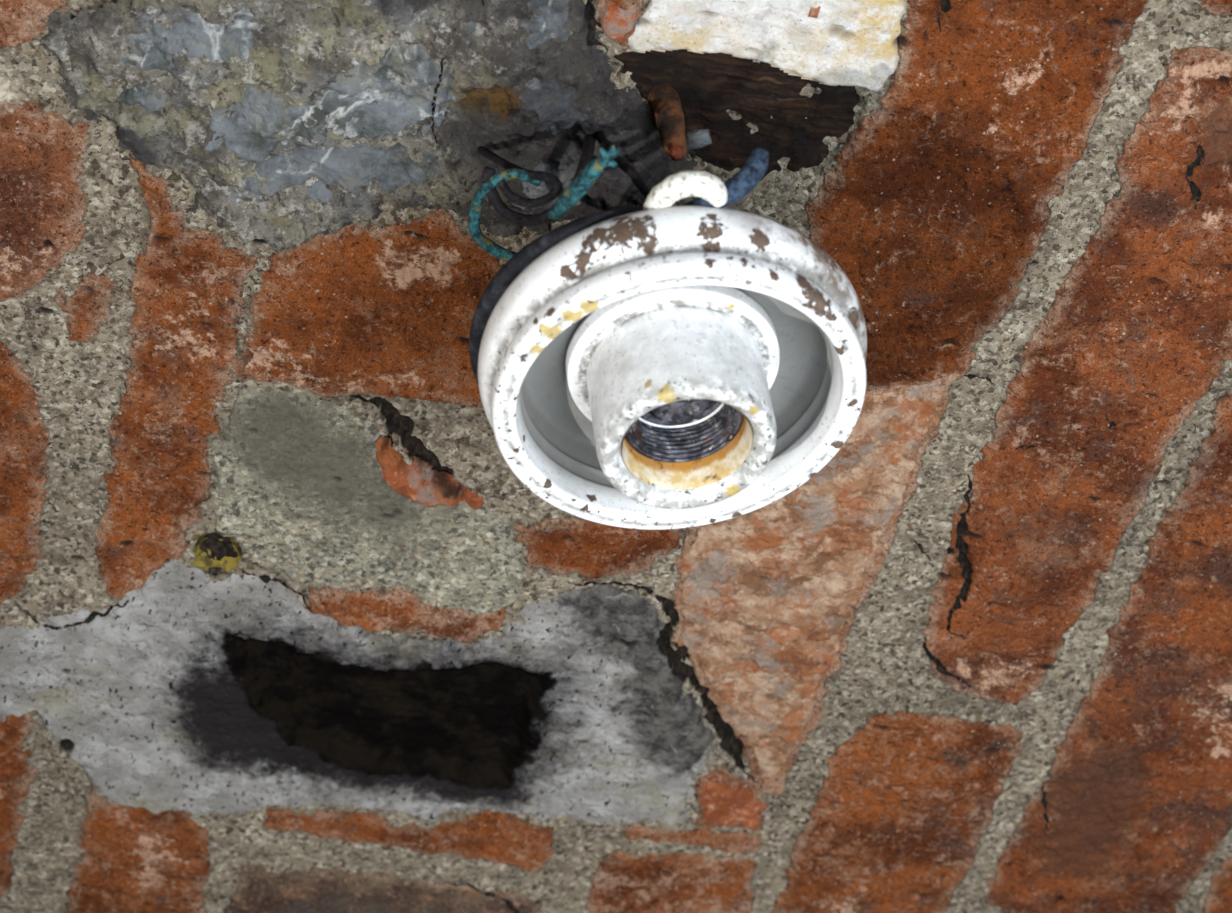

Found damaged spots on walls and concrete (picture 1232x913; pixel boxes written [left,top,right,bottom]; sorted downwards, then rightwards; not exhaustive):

spalling [36,0,698,252]
crack [322,394,452,474]
spalling [200,532,238,561]
crack [914,473,973,688]
peeling [0,625,50,720]
crack [569,581,763,788]
peeling [266,774,456,817]